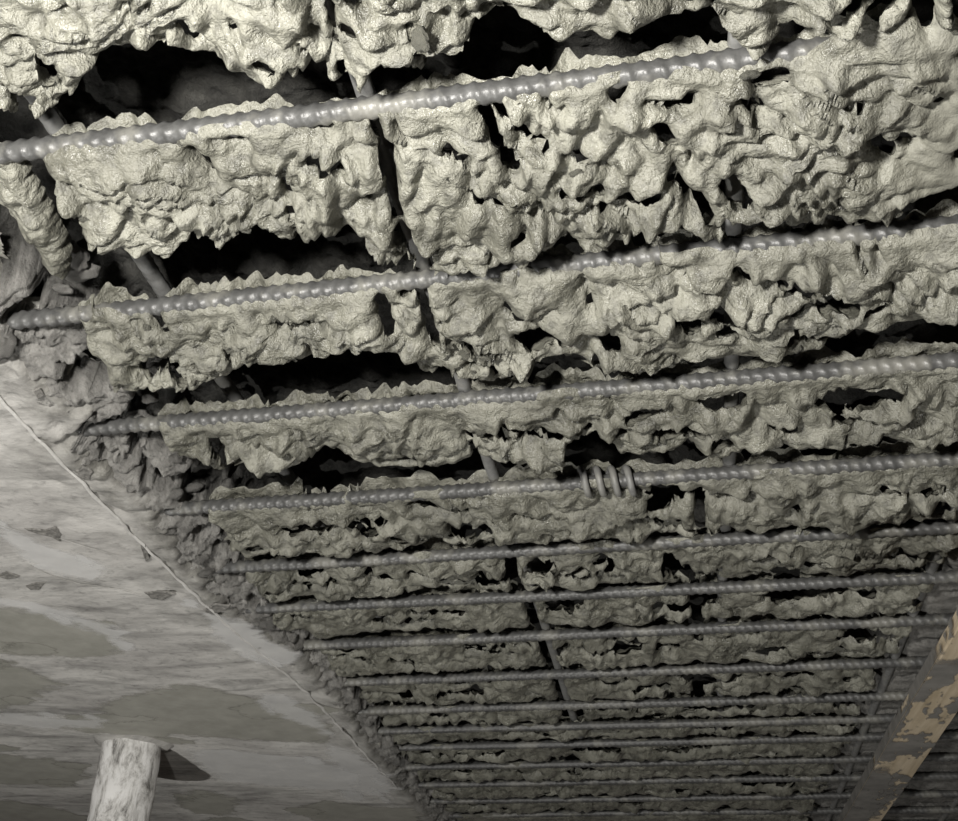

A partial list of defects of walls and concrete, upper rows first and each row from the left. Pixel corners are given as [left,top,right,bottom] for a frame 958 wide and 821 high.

spalling [369,0,728,94]
spalling [55,40,357,129]
spalling [0,94,50,143]
spalling [478,102,549,167]
spalling [667,165,725,230]
spalling [527,332,621,383]
spalling [811,319,958,358]
spalling [816,387,905,421]
spalling [487,423,708,468]
spalling [0,159,485,821]
spalling [639,484,706,528]
spalling [441,544,585,717]